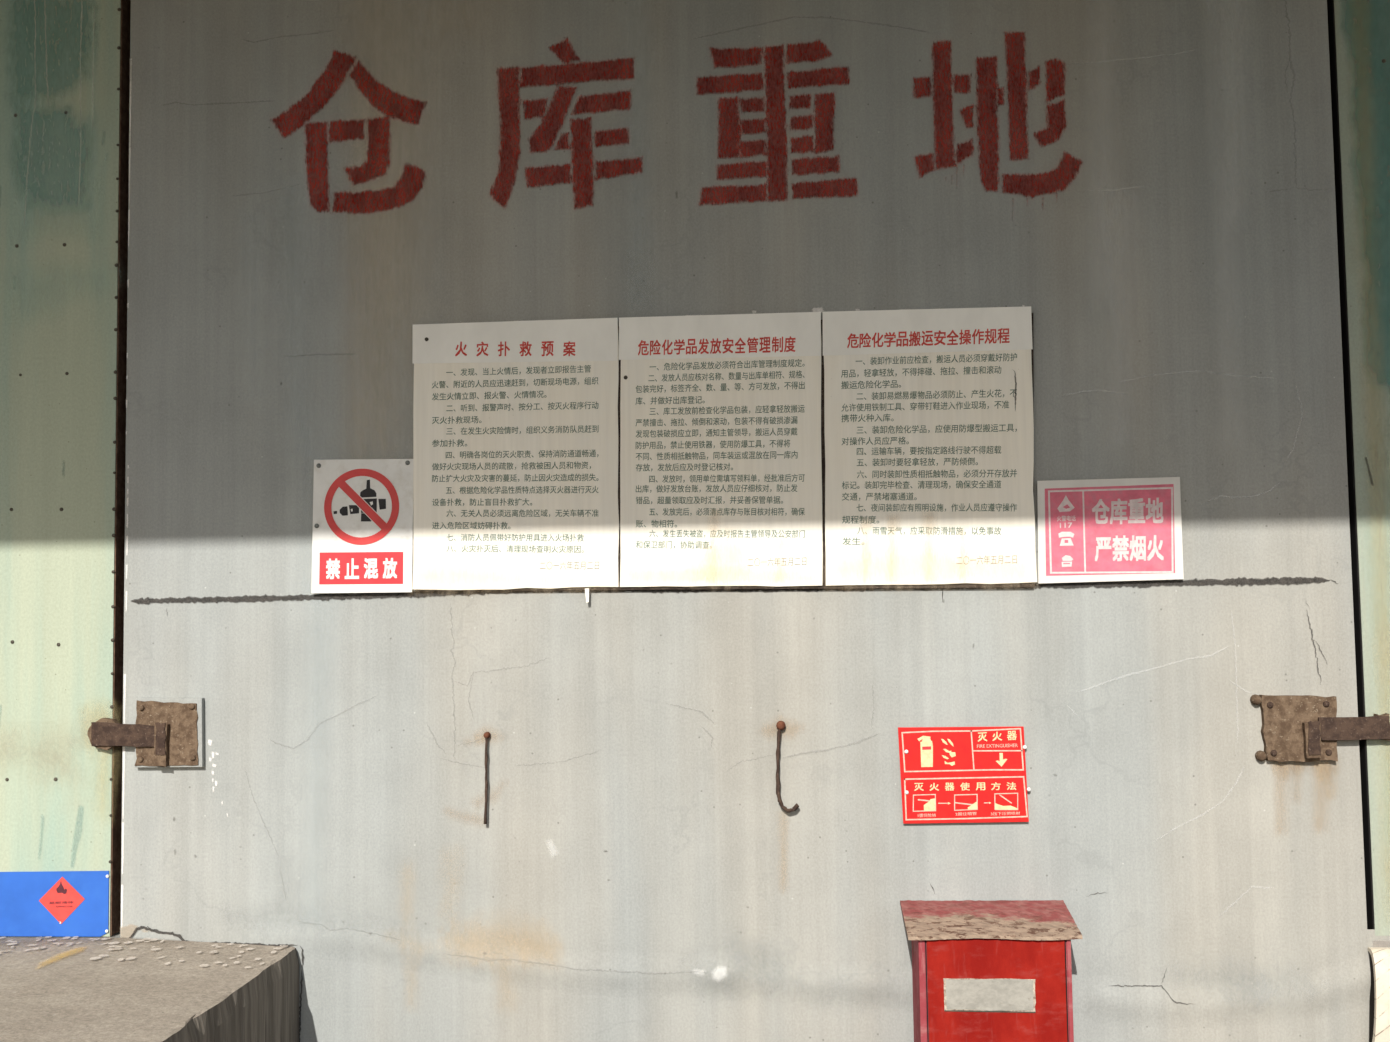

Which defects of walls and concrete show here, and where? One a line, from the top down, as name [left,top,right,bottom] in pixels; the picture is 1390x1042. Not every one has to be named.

peeling [1344,0,1390,388]